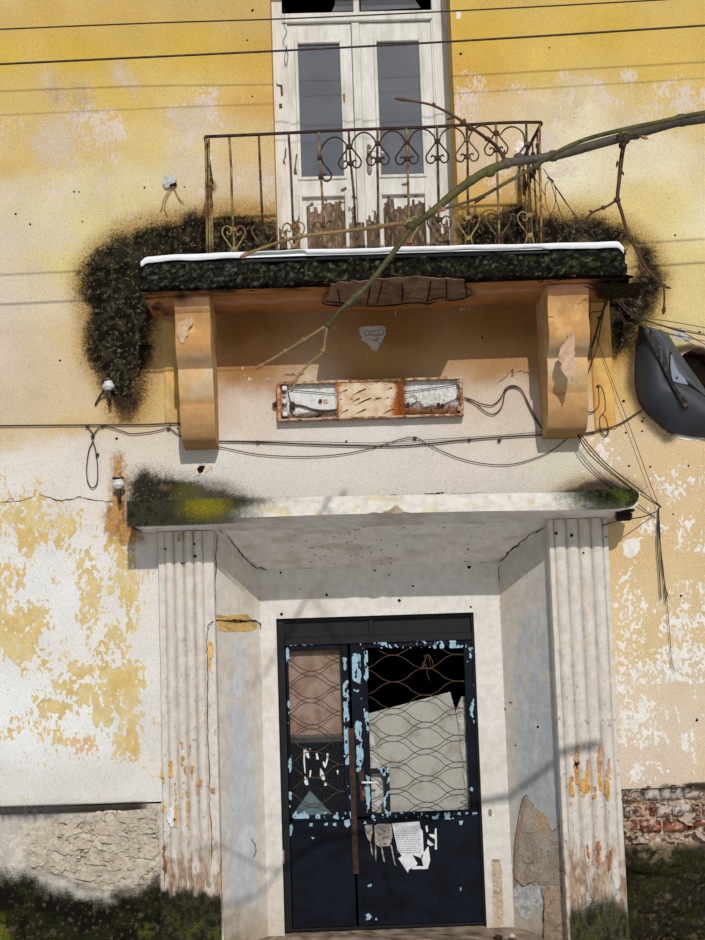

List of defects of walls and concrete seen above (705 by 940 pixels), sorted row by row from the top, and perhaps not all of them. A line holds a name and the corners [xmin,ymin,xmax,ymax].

leakage [73,205,278,424]
leakage [453,200,669,358]
peeling [558,332,575,384]
corrosion [105,455,144,550]
leakage [125,465,254,501]
peeling [569,431,624,477]
leakage [565,478,629,492]
peeling [0,482,147,763]
crack [206,531,265,857]
peeling [613,451,705,833]
flaking render [491,795,566,940]
peeling [587,841,613,870]